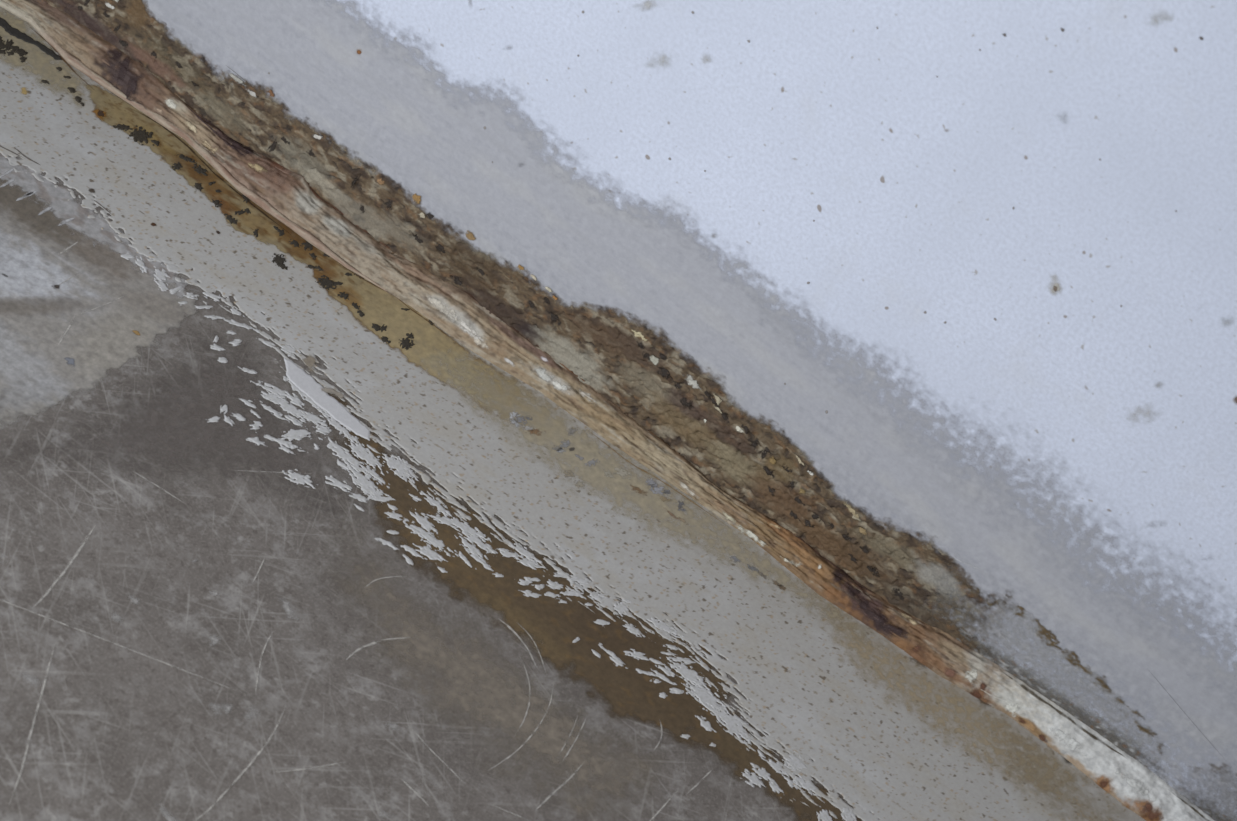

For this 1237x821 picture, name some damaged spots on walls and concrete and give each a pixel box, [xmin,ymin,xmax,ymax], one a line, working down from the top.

water stain [60,347,336,499]
peeling [121,252,857,821]
water stain [329,393,862,821]
water stain [955,619,1146,763]
rust [1126,801,1161,821]
water stain [1198,799,1236,821]